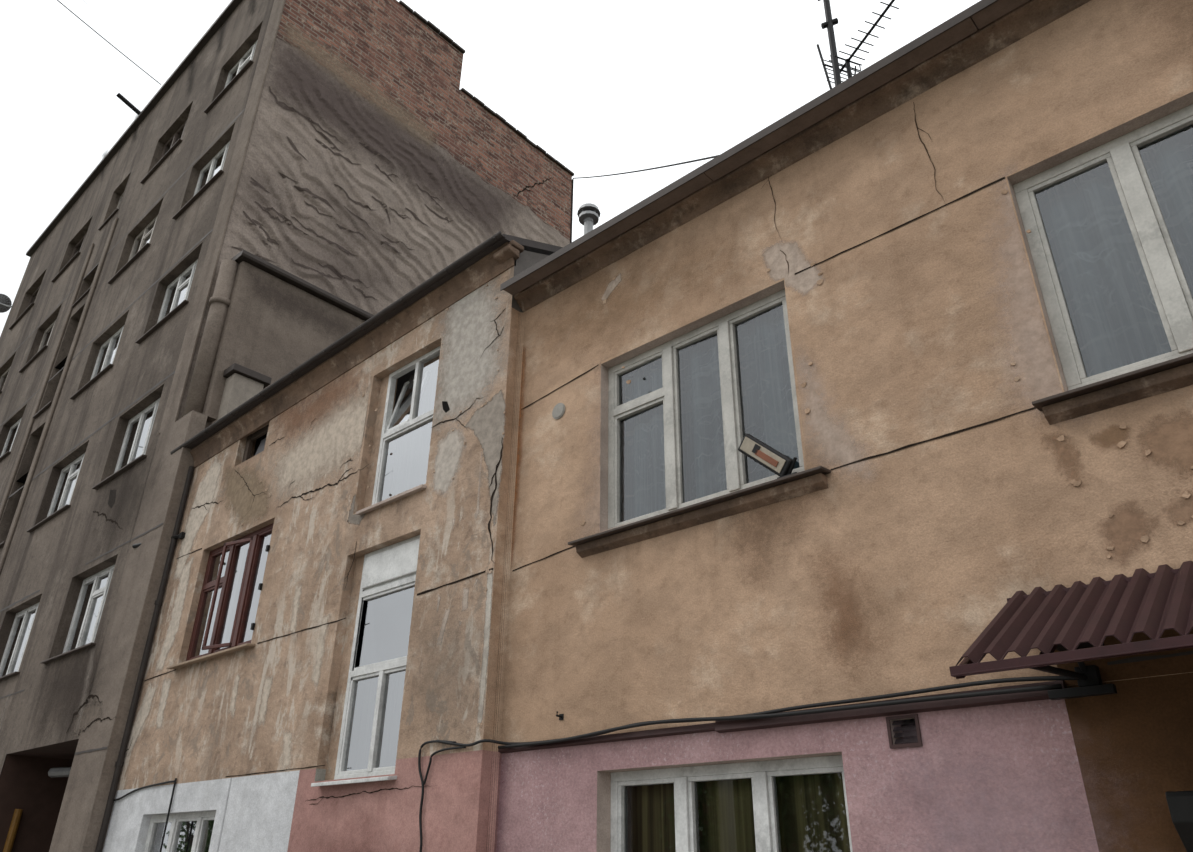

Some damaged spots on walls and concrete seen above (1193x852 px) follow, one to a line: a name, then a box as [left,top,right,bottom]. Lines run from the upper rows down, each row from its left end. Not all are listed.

crack [232,86,471,300]
crack [514,177,554,197]
crack [913,102,946,204]
peeling [763,242,823,294]
crack [192,460,369,510]
peeling [433,285,506,525]
crack [488,437,503,560]
flaking render [1093,424,1127,449]